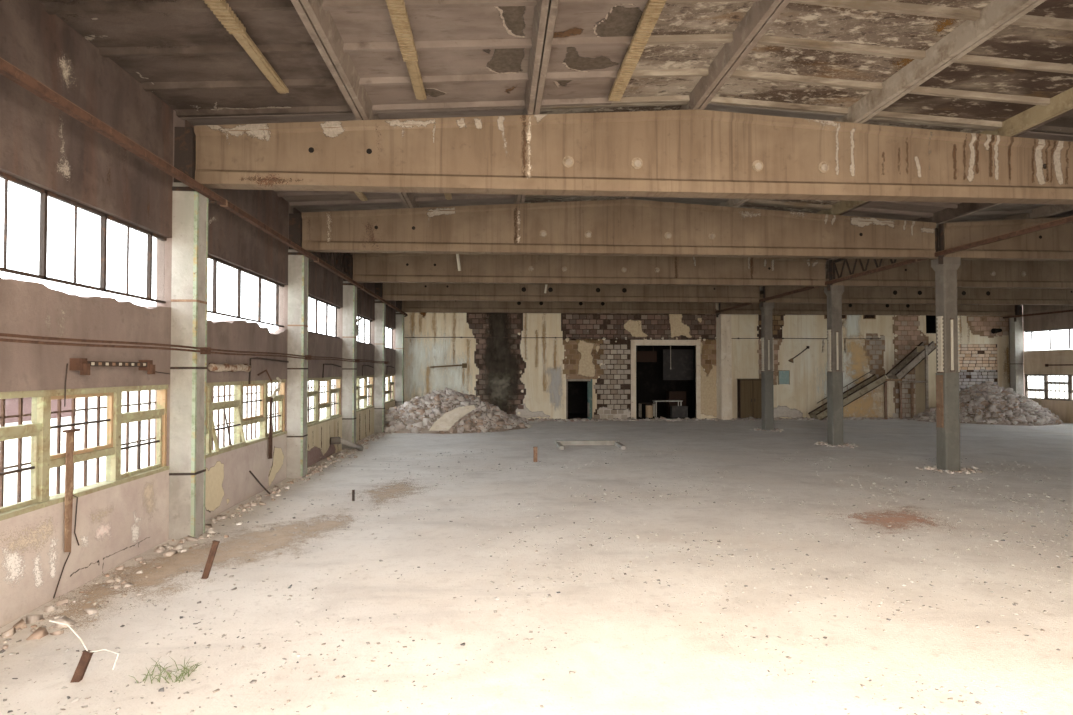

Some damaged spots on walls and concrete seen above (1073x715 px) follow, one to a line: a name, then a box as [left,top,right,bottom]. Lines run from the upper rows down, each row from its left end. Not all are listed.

peeling [553,5,642,88]
efflorescence [807,119,856,176]
efflorescence [898,132,934,178]
efflorescence [952,133,1014,182]
efflorescence [1031,139,1071,185]
spalling [466,313,550,419]
spalling [561,310,719,419]
spalling [757,314,785,385]
spalling [967,316,1009,338]
peeling [205,461,230,512]
peeling [268,446,284,487]